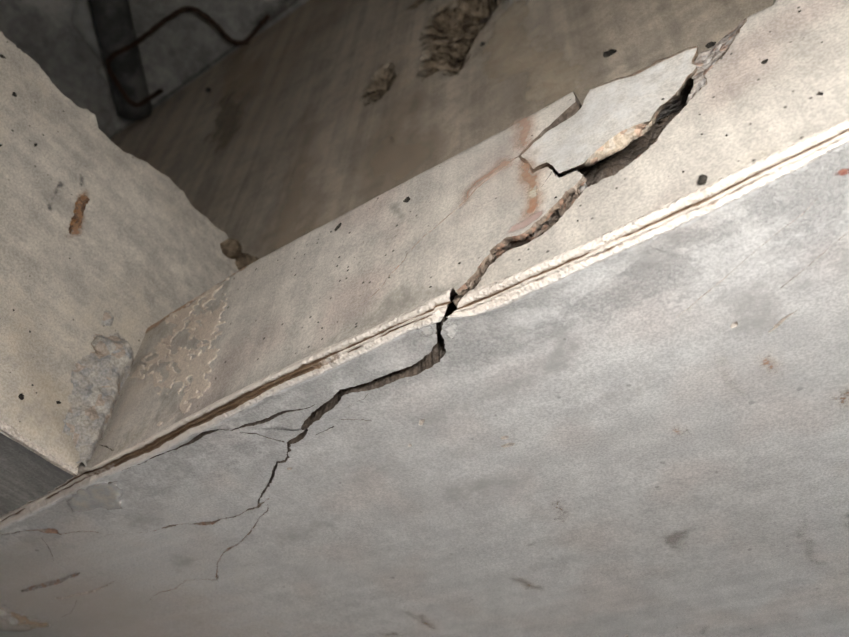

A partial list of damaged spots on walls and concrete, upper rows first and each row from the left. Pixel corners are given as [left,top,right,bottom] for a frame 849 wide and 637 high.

water stain [486,0,580,102]
crack [634,18,747,160]
rust [521,163,538,214]
crack [107,91,614,594]
crack [0,528,114,560]